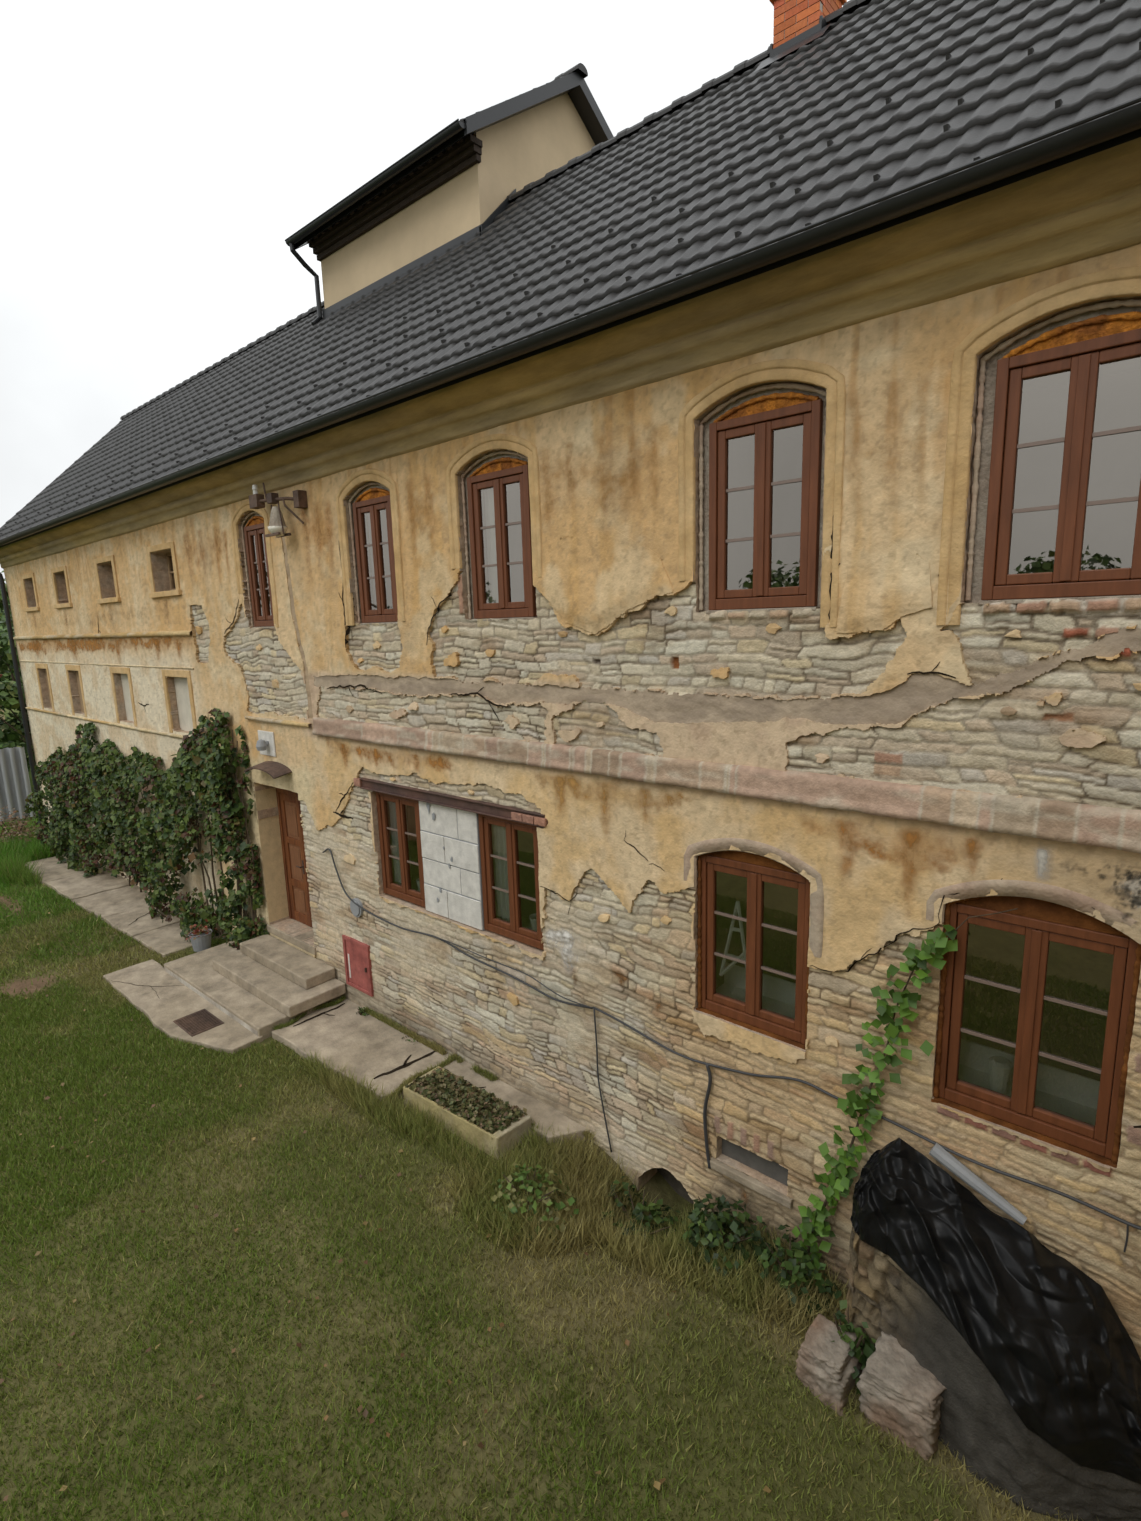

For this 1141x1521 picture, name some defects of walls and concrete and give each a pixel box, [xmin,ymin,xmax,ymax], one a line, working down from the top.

spalling [192,571,907,756]
spalling [786,598,1141,810]
leakage [1116,869,1141,908]
spalling [300,767,1141,1359]